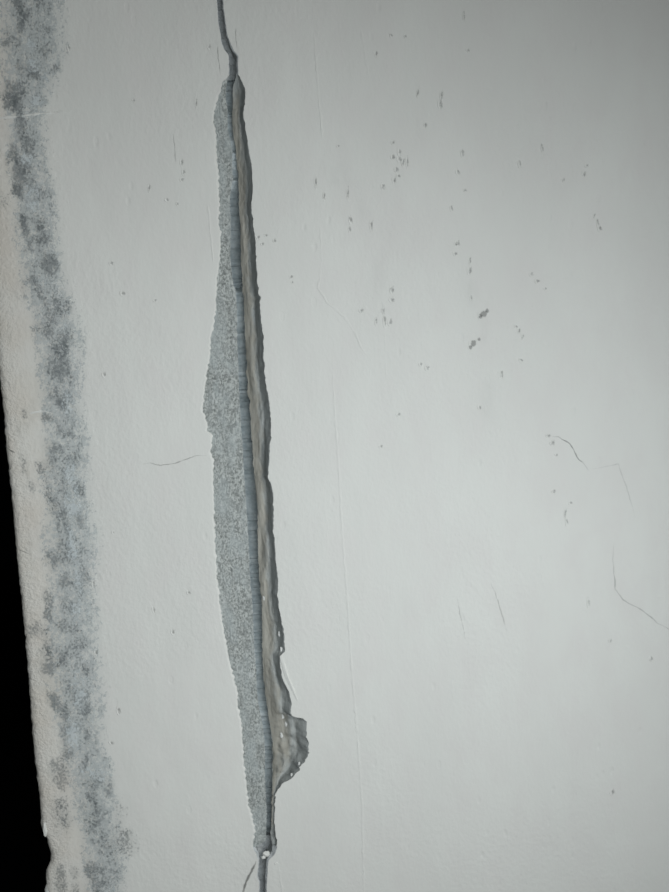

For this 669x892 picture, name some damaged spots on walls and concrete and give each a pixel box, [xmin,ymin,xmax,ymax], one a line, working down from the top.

spalling [200,74,267,848]
crack [217,0,309,892]